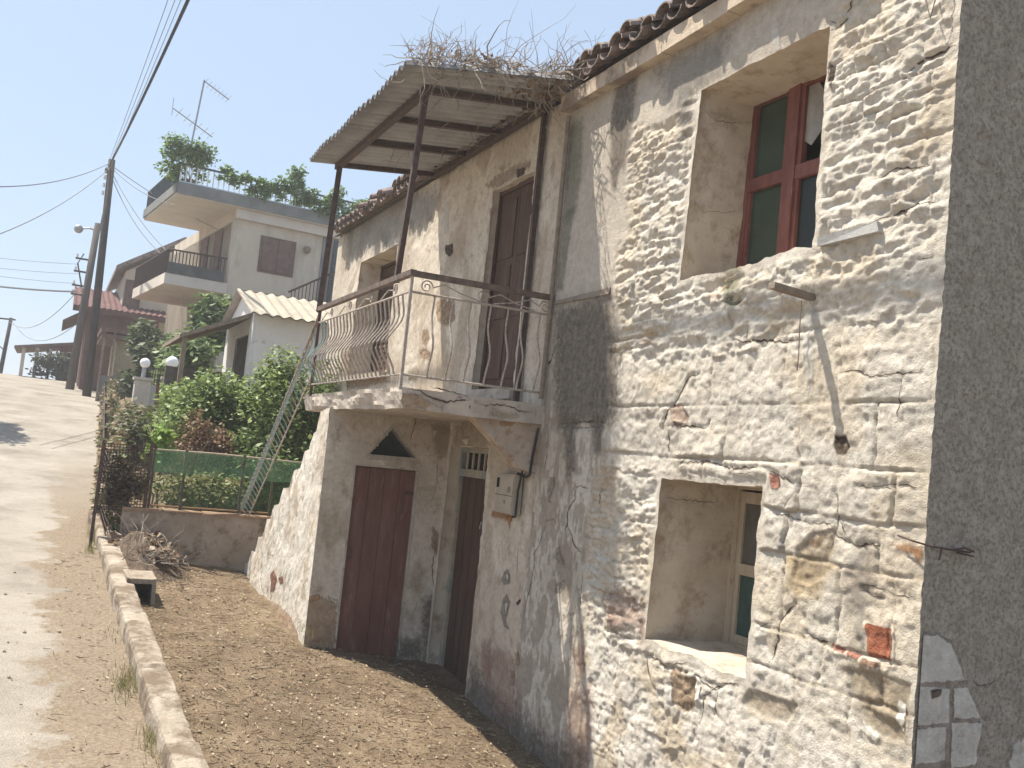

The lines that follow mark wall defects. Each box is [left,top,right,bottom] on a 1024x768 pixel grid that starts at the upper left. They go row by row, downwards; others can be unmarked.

crack [413,386,524,412]
leakage [553,297,618,477]
crack [664,370,917,559]
crack [517,486,603,622]
peeling [268,570,337,649]
peeling [501,570,521,630]
spalling [830,619,897,672]
spalling [858,721,879,741]
spalling [896,633,982,768]